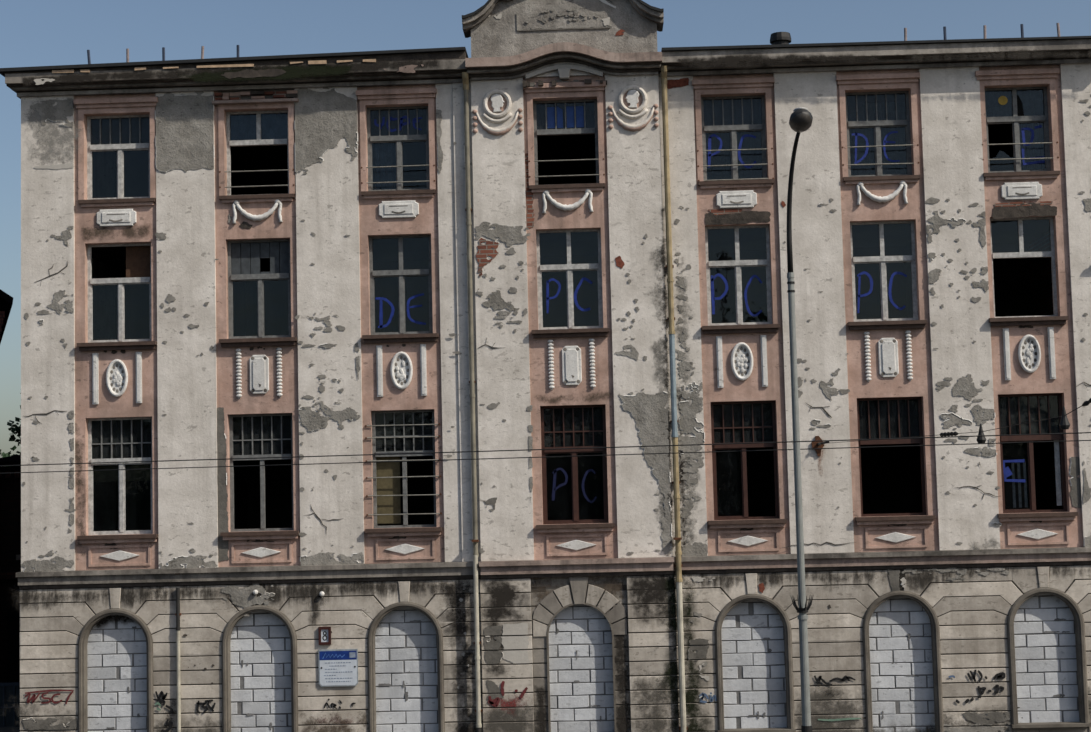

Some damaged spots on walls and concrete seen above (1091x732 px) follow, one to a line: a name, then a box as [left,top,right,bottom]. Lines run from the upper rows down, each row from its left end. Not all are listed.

peeling [155,91,215,174]
peeling [294,87,358,175]
crack [34,261,68,286]
peeling [474,153,535,333]
peeling [925,197,989,308]
leakage [653,240,698,545]
peeling [936,374,997,474]
crack [303,504,344,531]
leakage [14,585,230,628]
leakage [759,571,873,586]
leakage [887,567,990,589]
leakage [247,579,547,732]